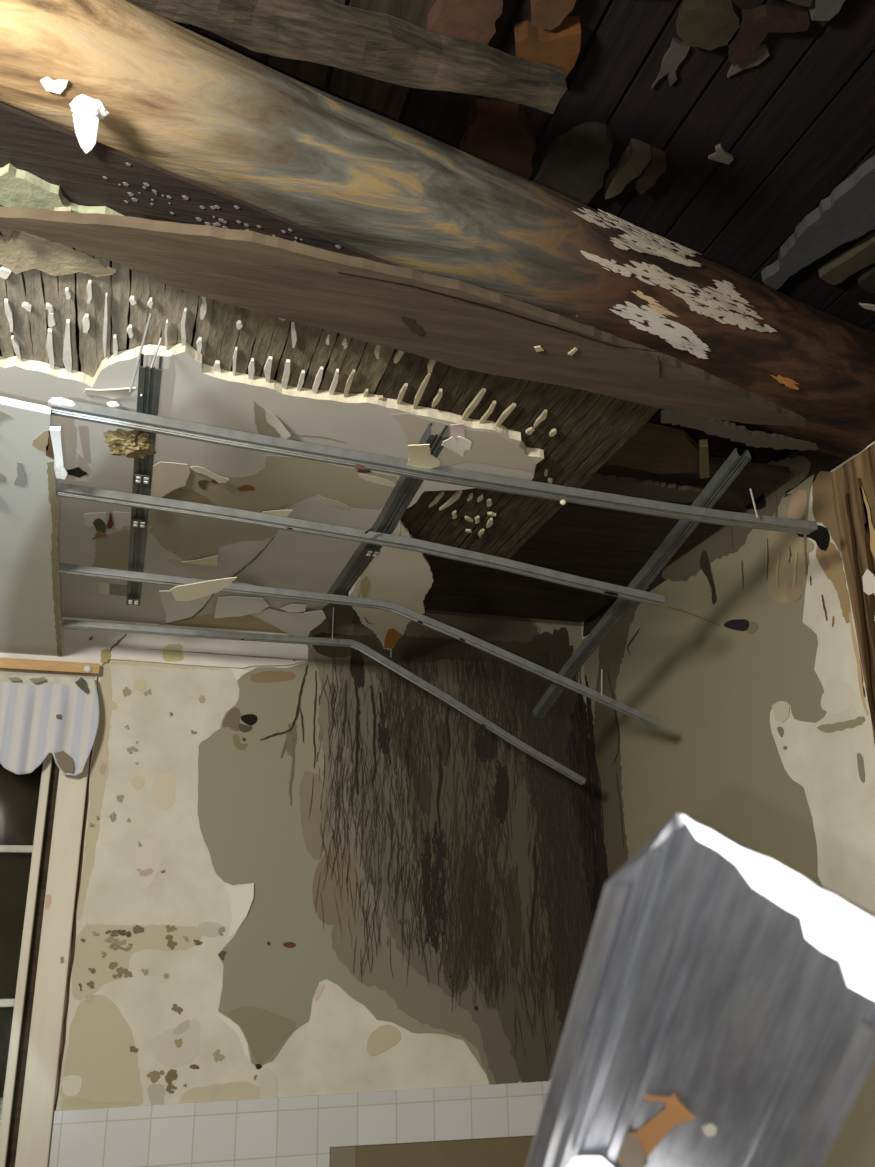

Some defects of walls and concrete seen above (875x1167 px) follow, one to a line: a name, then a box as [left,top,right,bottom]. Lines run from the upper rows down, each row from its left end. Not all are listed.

peeling [40,77,109,153]
peeling [573,207,777,359]
flaking render [50,426,68,480]
damp [359,474,395,487]
peeling [392,414,536,472]
peeling [745,474,829,551]
damp [738,456,850,623]
peeling [862,569,875,595]
damp [59,644,296,1111]
peeling [148,456,491,1084]
damp [281,525,752,1084]
peeling [615,529,827,887]